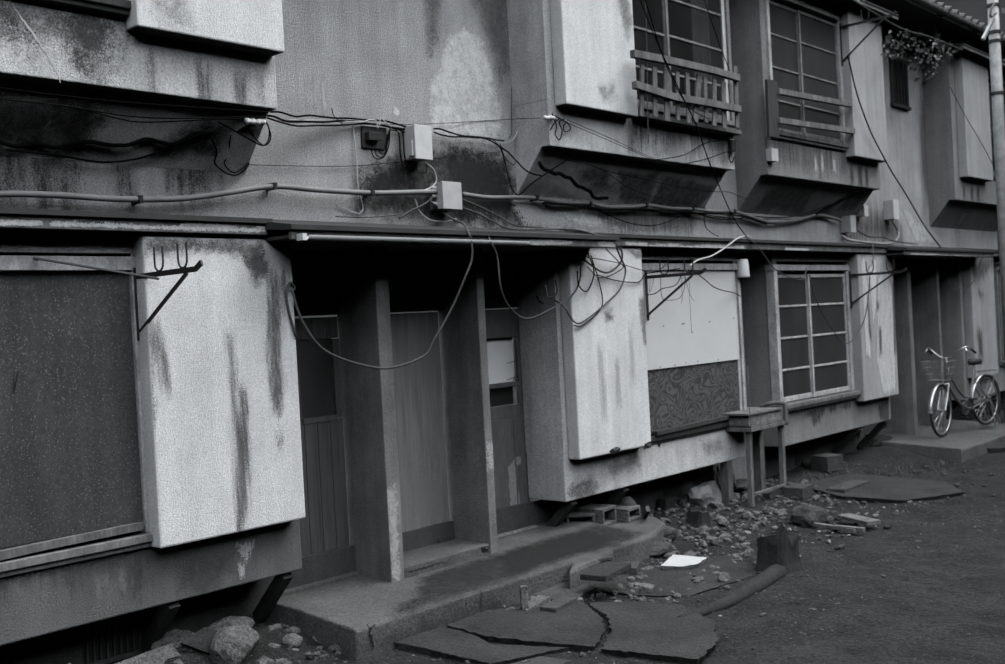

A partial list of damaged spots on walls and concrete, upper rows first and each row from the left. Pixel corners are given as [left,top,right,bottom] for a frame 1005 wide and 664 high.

leakage [0,0,129,83]
leakage [196,58,210,99]
leakage [234,73,247,104]
leakage [351,0,542,229]
leakage [228,340,255,580]